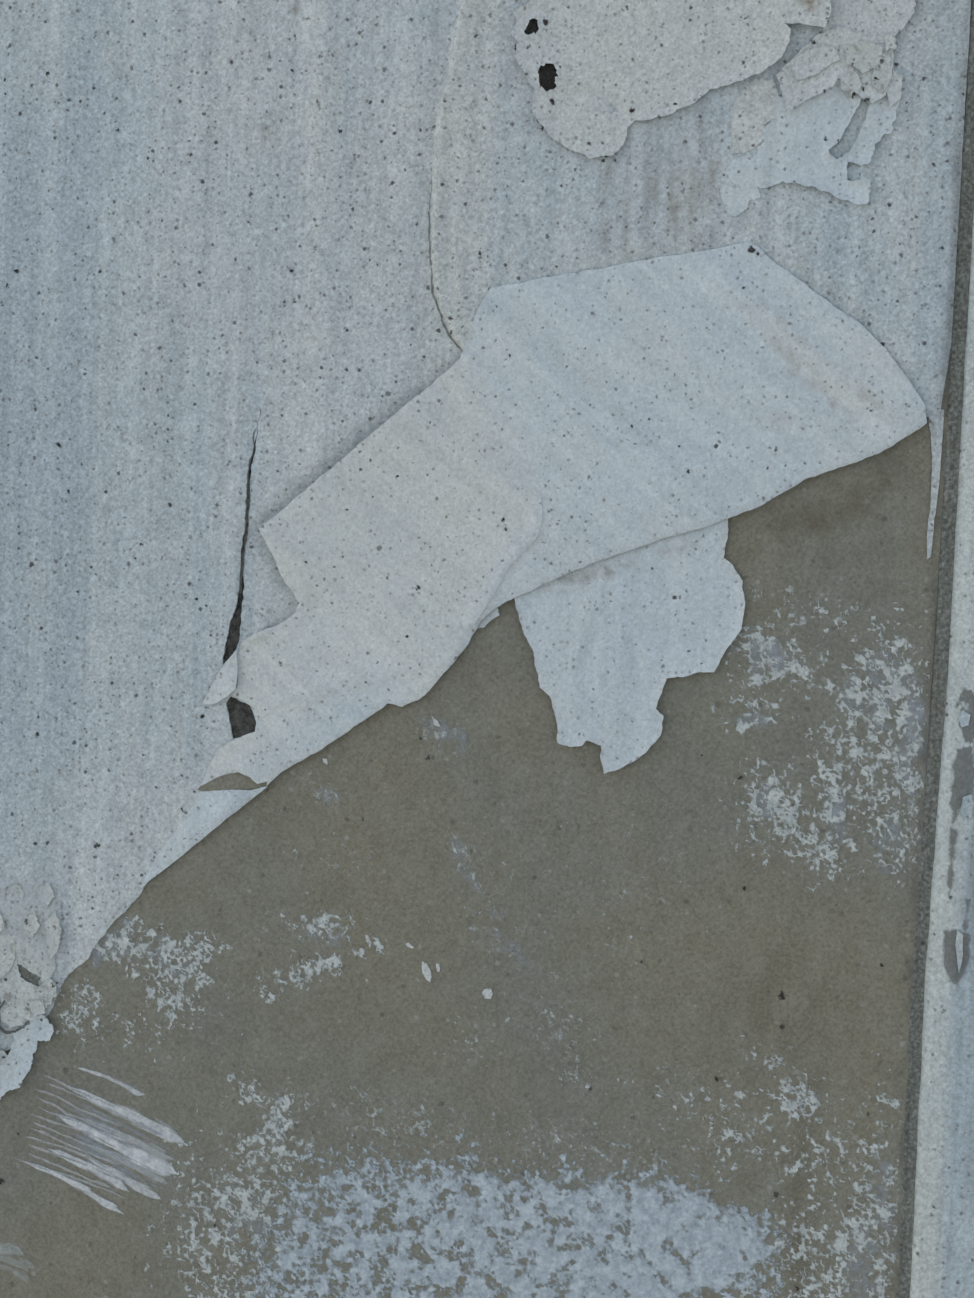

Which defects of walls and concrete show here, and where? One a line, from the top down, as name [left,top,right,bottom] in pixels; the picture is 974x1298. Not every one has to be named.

peeling [510,0,918,217]
crack [223,409,261,664]
peeling [0,242,948,1298]
spalling [948,688,974,894]
spalling [944,899,969,984]